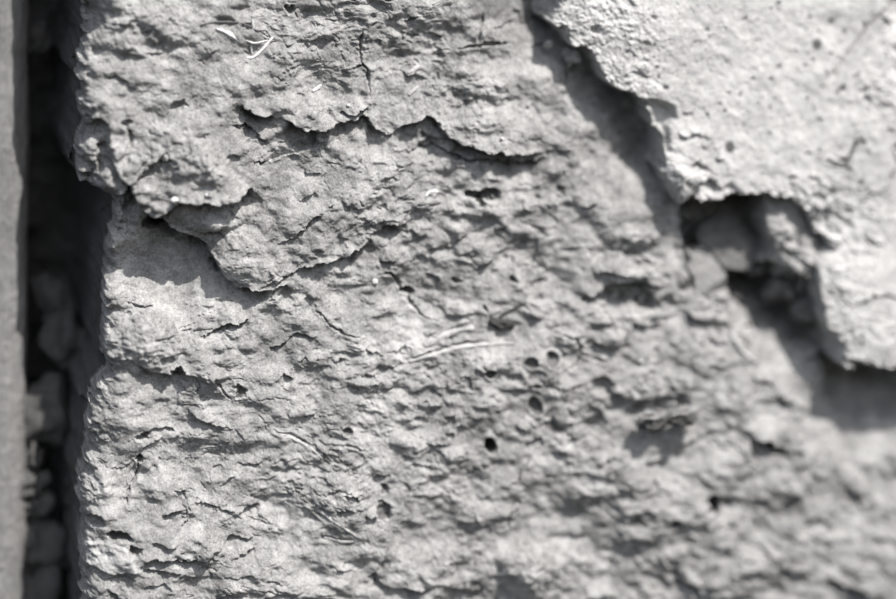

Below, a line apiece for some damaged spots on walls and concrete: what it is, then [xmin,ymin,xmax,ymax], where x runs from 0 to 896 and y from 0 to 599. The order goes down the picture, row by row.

crack [826,140,863,172]
spalling [531,0,896,412]
spalling [706,494,731,514]